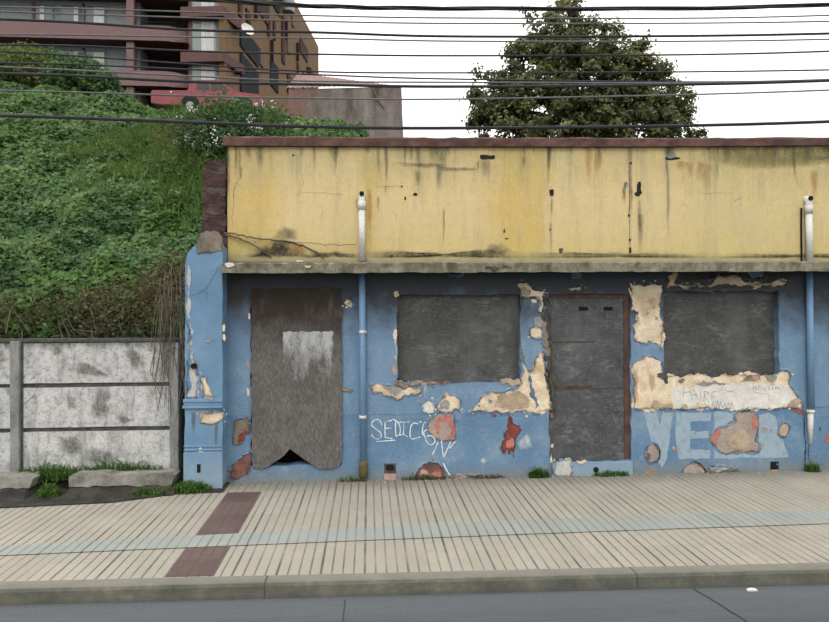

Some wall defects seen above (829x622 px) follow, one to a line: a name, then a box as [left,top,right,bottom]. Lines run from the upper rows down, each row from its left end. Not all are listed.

damp [723,147,829,165]
damp [257,231,299,256]
peeling [185,266,214,399]
peeling [369,283,556,457]
peeling [628,271,805,474]
flaking render [196,409,251,482]
flaking render [412,459,483,479]